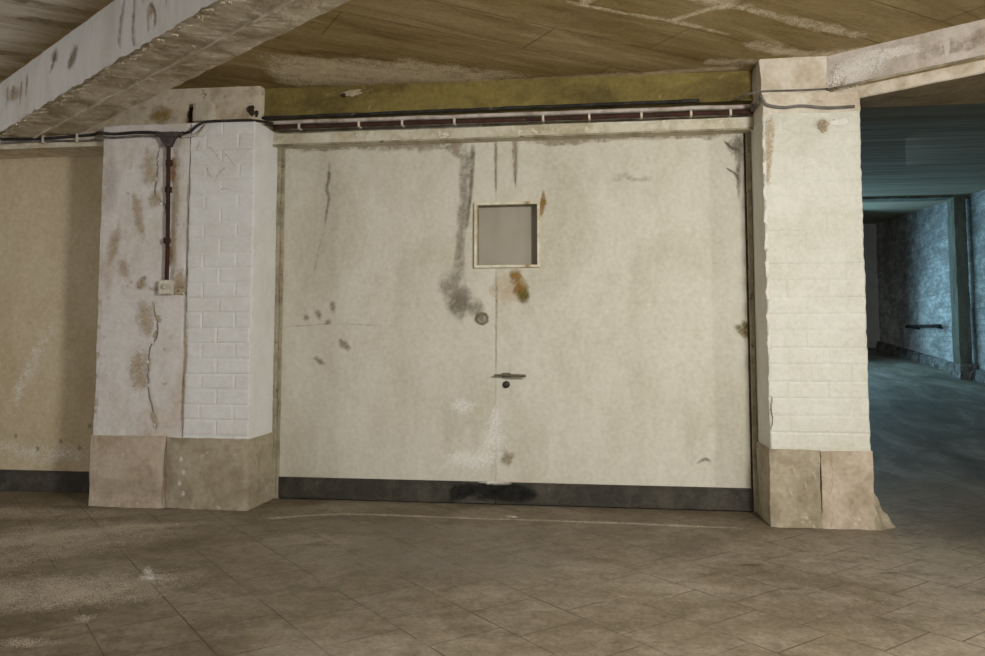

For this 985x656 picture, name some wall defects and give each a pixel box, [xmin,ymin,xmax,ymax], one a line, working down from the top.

damp [359,143,488,325]
rust [488,272,528,306]